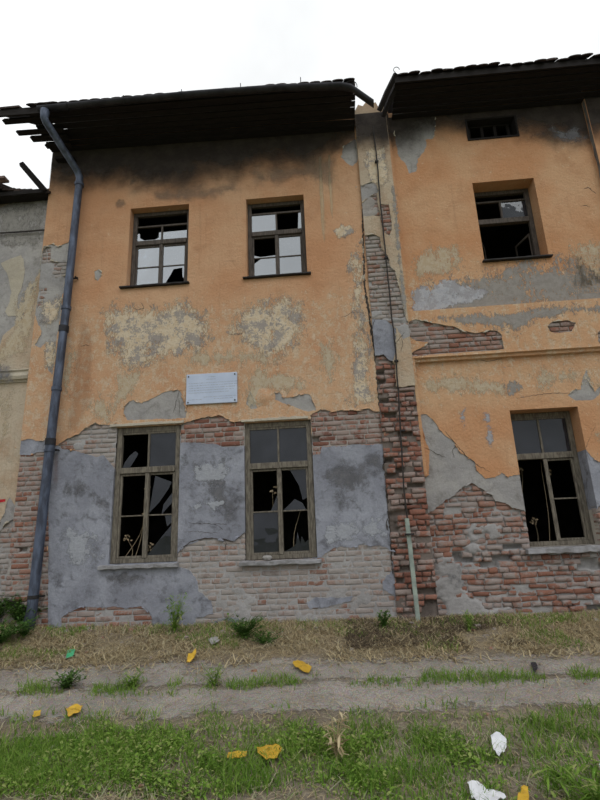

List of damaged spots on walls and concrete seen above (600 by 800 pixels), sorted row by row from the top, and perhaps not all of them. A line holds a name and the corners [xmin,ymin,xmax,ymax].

flaking render [393,110,436,173]
flaking render [0,190,69,374]
peeling [99,297,215,374]
spalling [176,140,600,624]
flaking render [58,422,118,468]
flaking render [123,389,246,447]
flaking render [61,606,152,628]